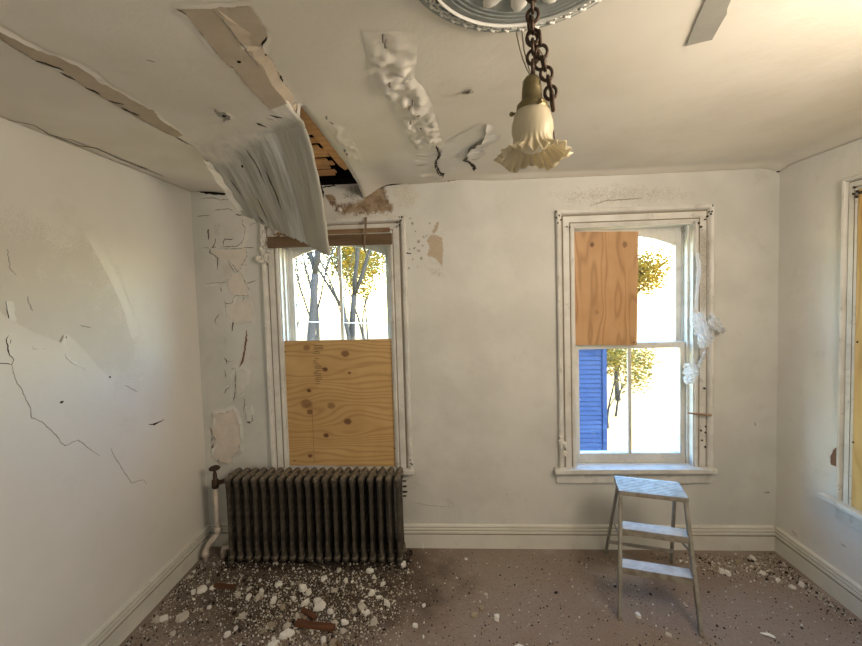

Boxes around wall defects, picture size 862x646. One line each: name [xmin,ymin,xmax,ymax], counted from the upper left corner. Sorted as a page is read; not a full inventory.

peeling [0,23,189,142]
peeling [204,161,243,211]
peeling [439,123,501,173]
peeling [0,204,150,399]
crack [0,298,147,485]